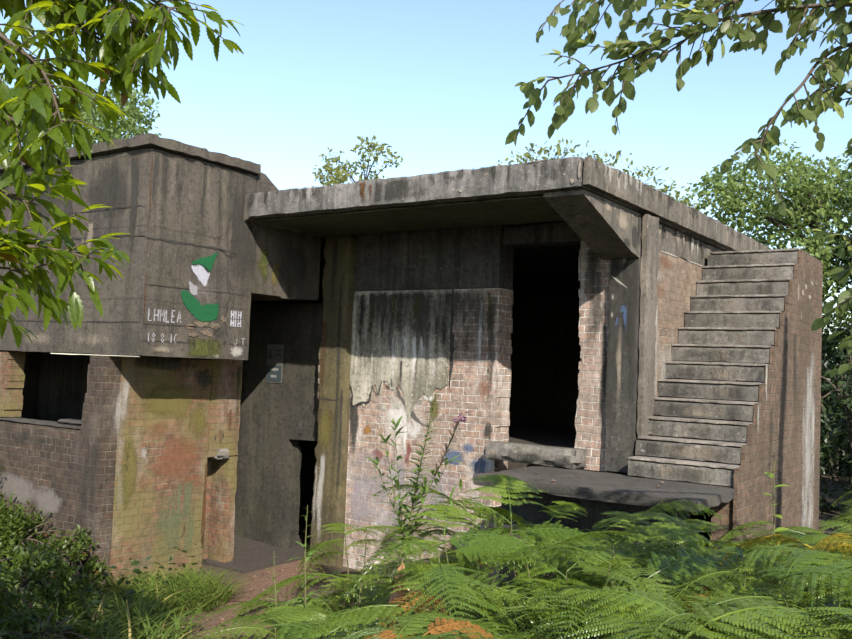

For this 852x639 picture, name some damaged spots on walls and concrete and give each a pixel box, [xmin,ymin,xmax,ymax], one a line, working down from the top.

leakage [375,179,425,200]
leakage [390,336,424,378]
leakage [116,383,129,427]
crack [317,379,392,407]